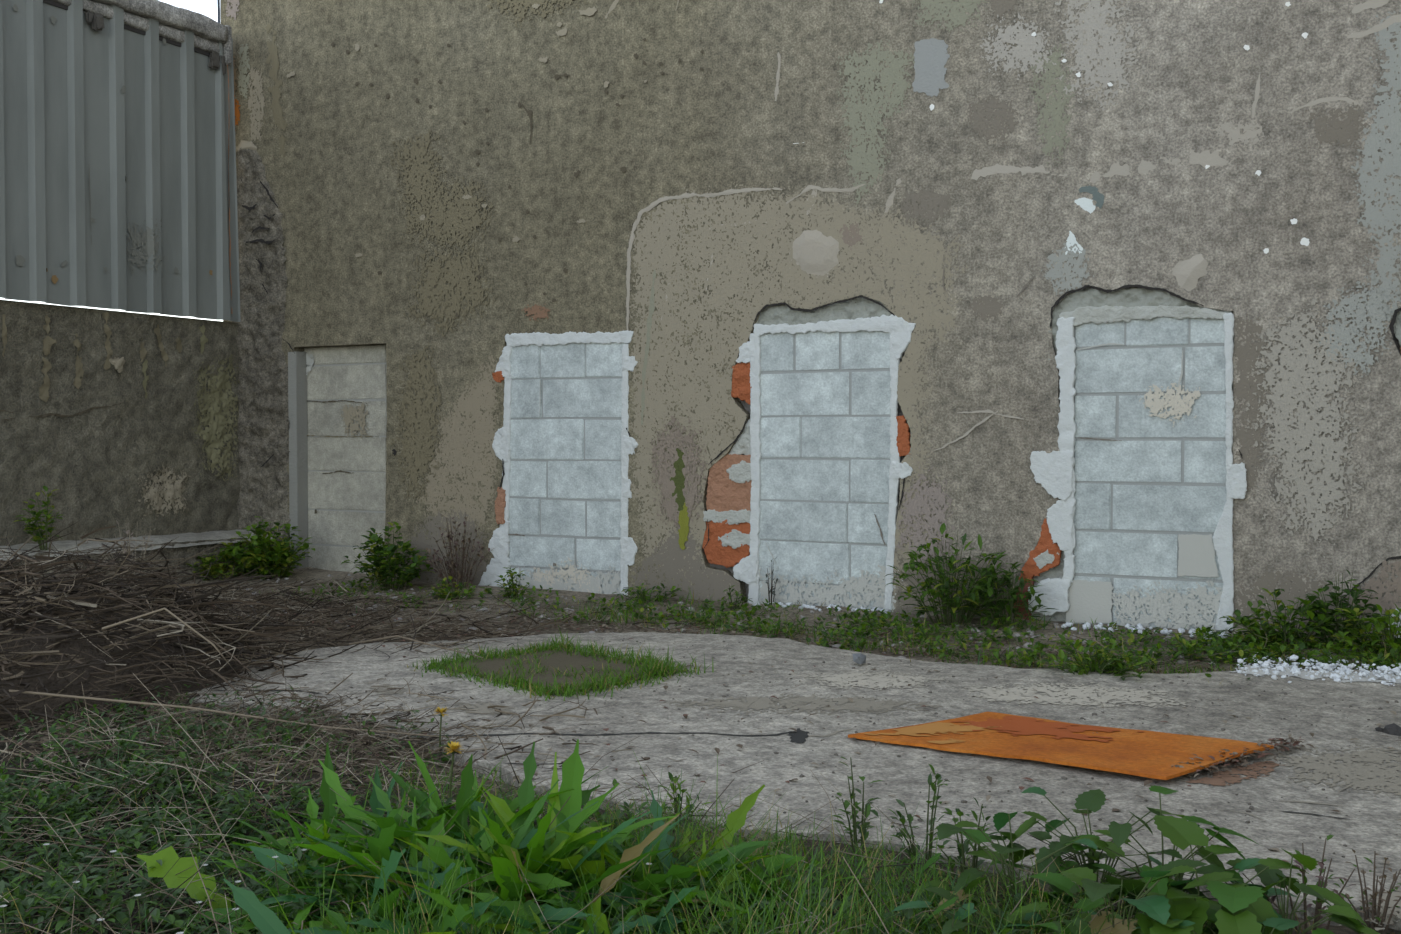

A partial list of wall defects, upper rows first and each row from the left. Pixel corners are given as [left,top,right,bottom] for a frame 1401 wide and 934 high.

flaking render [492,371,504,383]
flaking render [731,362,752,405]
flaking render [895,415,911,457]
flaking render [495,487,506,524]
flaking render [702,454,752,568]
flaking render [1013,518,1062,620]
crack [1339,556,1401,602]